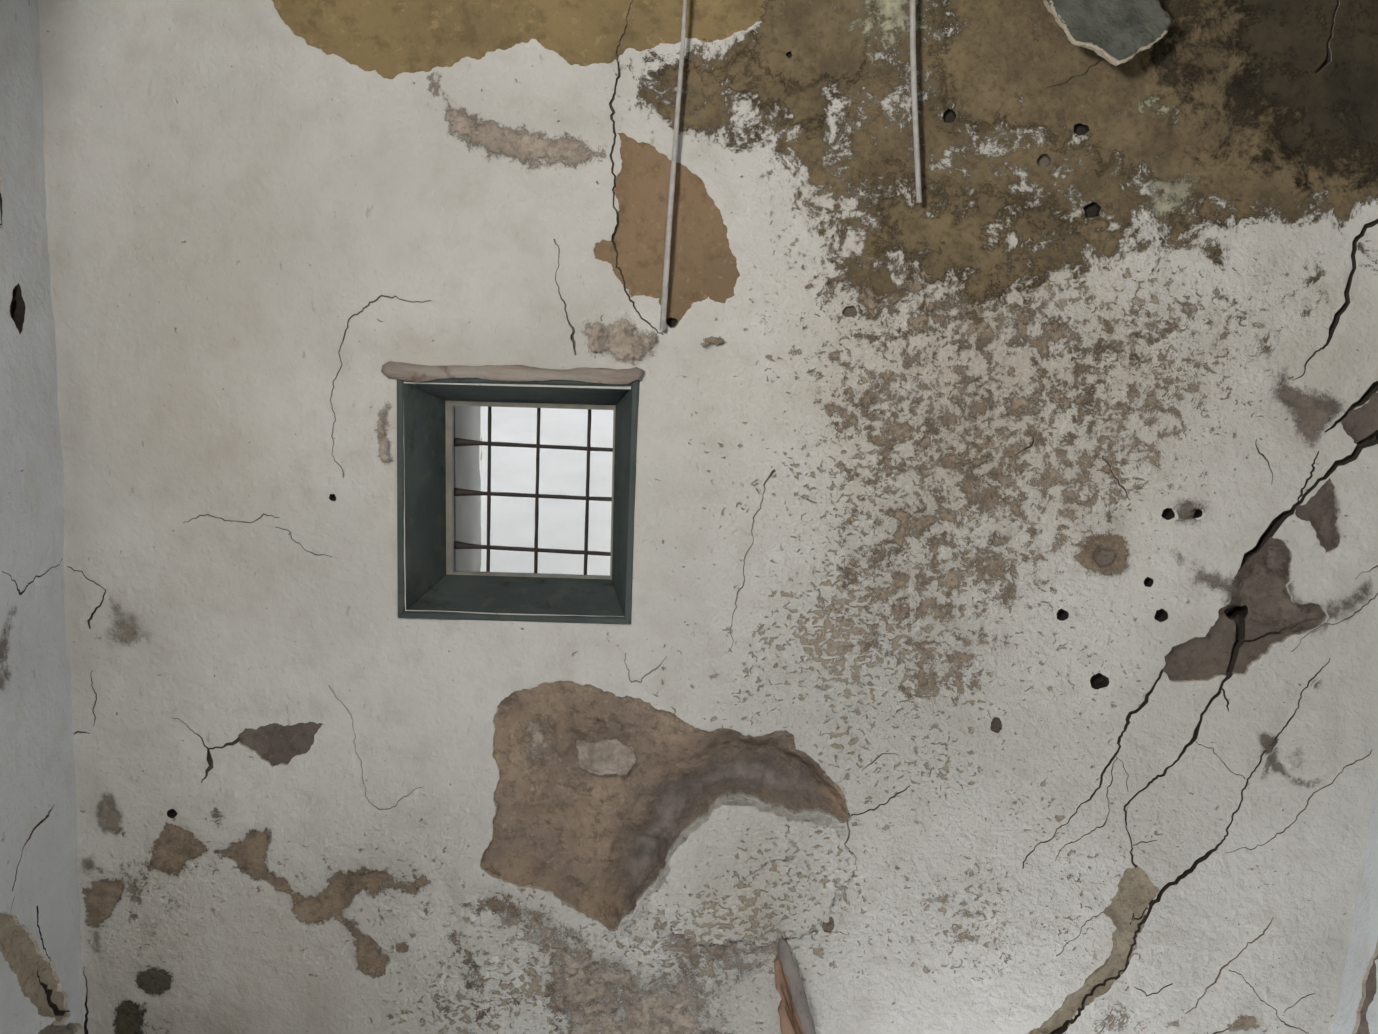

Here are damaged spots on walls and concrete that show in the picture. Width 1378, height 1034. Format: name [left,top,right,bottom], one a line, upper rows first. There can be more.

flaking render [272,0,768,328]
crack [609,0,664,335]
damp [928,0,1378,228]
crack [330,295,431,476]
flaking render [790,275,1243,713]
crack [1240,381,1378,569]
flaking render [1162,537,1323,681]
crack [0,805,89,1034]
flaking render [239,722,322,767]
flaking render [214,828,432,979]
flaking render [439,681,850,1034]
crack [1022,565,1378,1034]